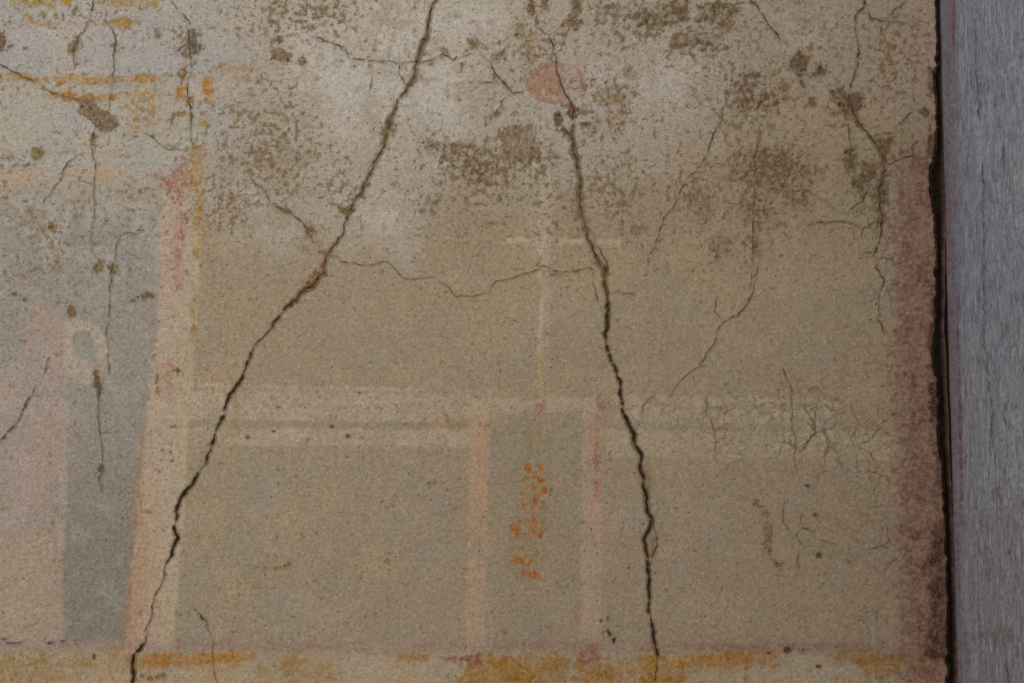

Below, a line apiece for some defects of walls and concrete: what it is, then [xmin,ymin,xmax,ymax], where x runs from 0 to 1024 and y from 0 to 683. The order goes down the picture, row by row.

crack [727,0,789,47]
crack [0,63,80,102]
crack [42,0,145,495]
crack [129,0,760,683]
crack [799,0,958,683]
crack [0,357,50,442]
crack [780,365,829,472]
crack [753,500,835,572]